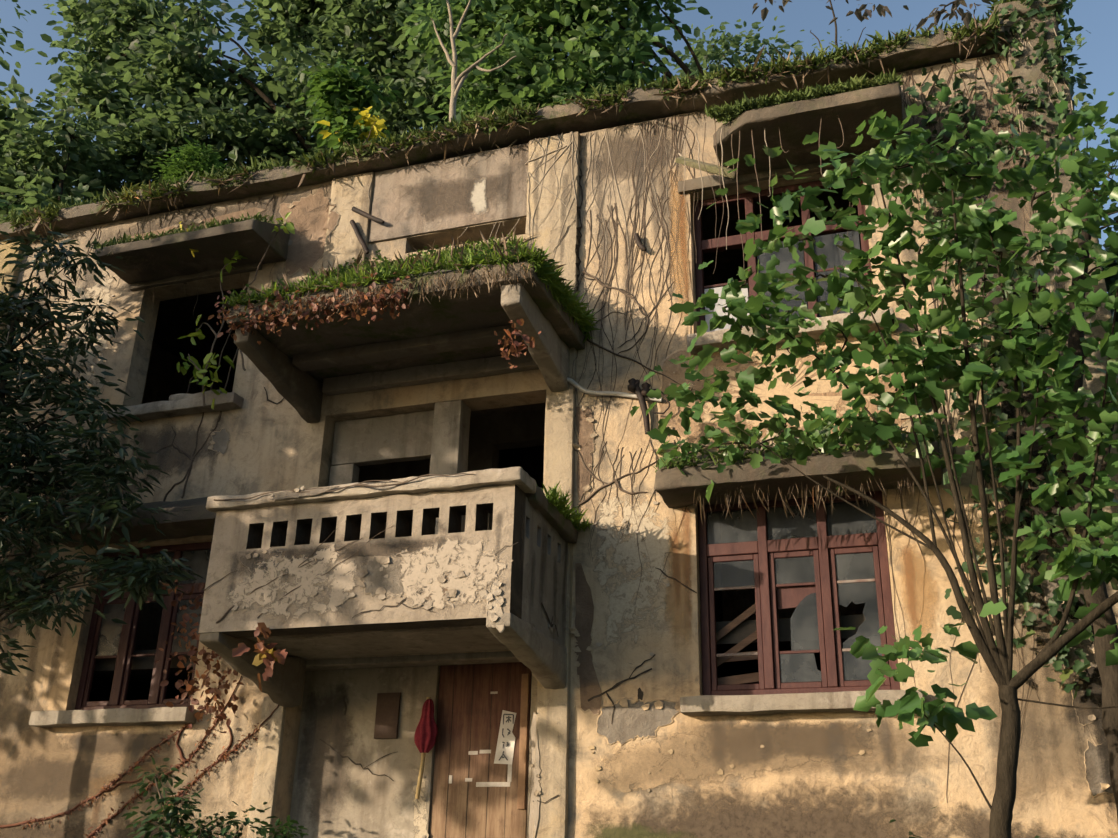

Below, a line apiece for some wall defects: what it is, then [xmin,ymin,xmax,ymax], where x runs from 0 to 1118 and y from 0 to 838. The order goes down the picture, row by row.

crack [553,150,666,348]
damp [918,101,1094,648]
spalling [572,406,597,502]
peeling [227,538,513,633]
flaking render [568,485,874,793]
damp [3,732,173,799]
damp [0,819,245,838]
damp [710,722,869,763]
damp [594,782,990,838]
damp [1011,823,1078,838]
damp [1061,664,1112,808]